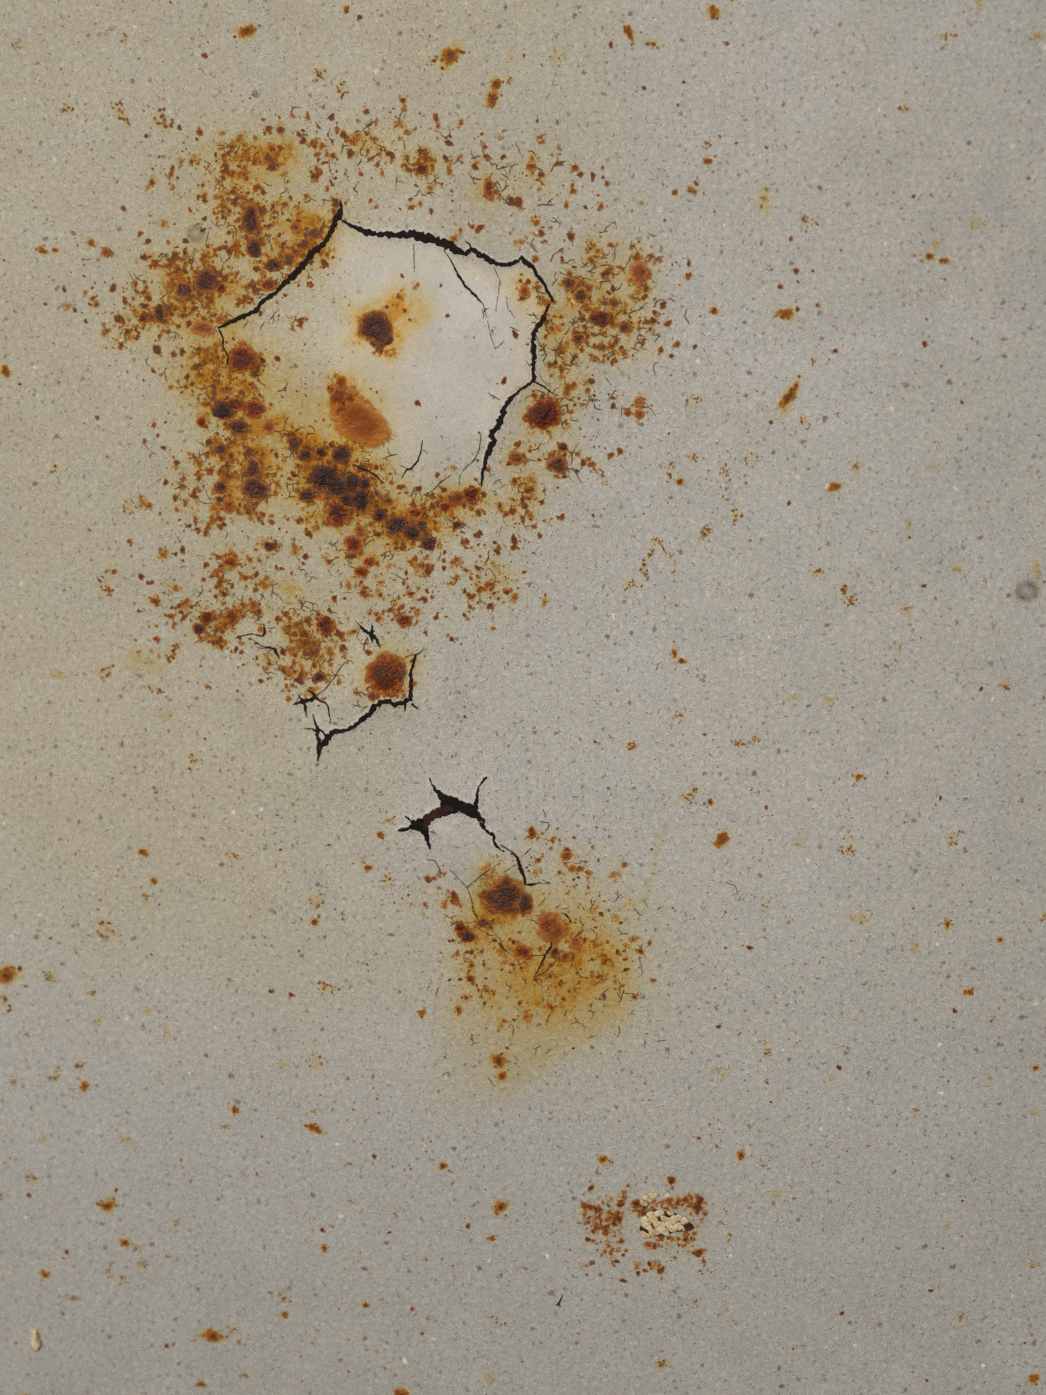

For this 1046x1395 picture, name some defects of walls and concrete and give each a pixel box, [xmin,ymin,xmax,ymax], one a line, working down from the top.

crack [217,201,554,496]
rust [6,68,849,791]
crack [292,620,424,762]
crack [394,774,584,979]
rust [352,810,666,1083]
peeling [580,1176,708,1293]